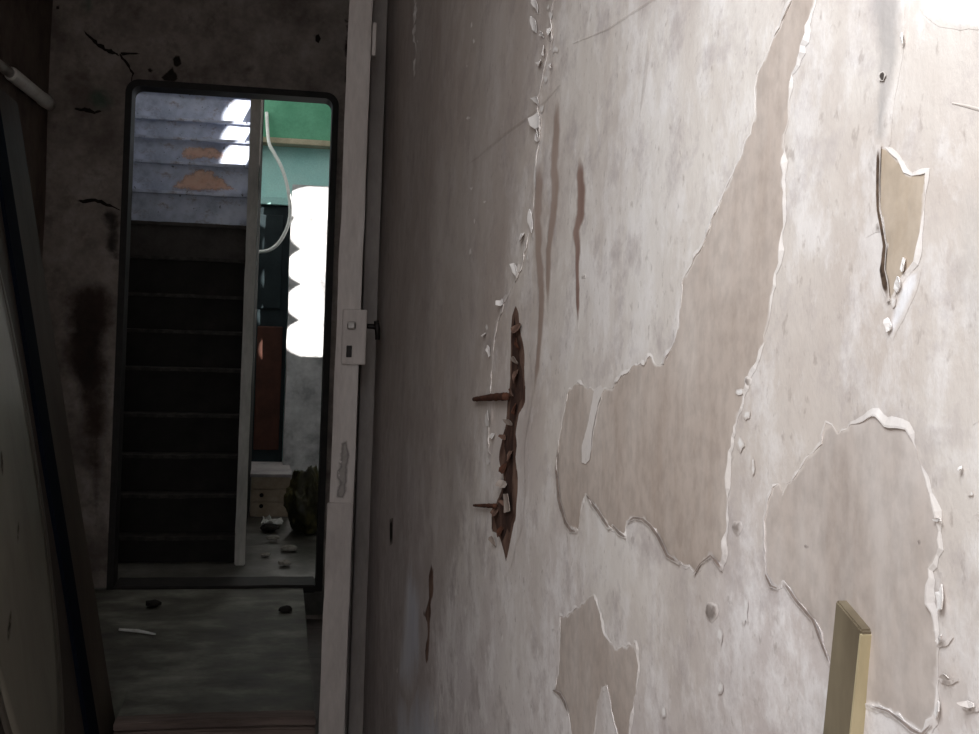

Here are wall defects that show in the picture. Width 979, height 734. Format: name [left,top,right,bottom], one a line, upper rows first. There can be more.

crack [73,106,102,114]
crack [82,29,142,81]
crack [77,198,121,280]
peeling [481,0,558,465]
rust [572,152,587,331]
peeling [554,0,817,574]
peeling [875,144,930,340]
damp [53,268,118,575]
peeling [551,593,640,734]
peeling [762,408,958,734]